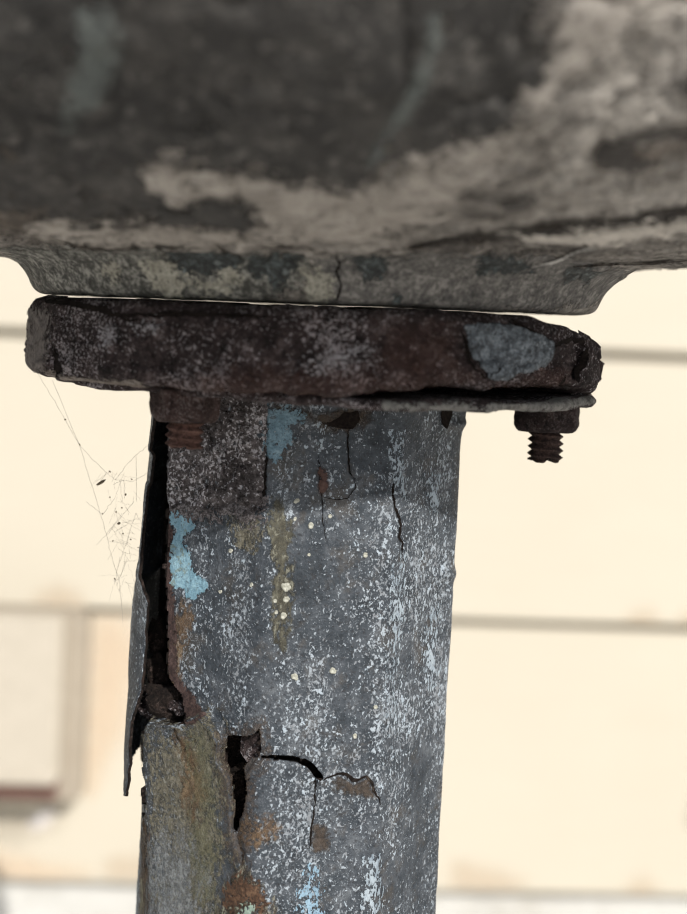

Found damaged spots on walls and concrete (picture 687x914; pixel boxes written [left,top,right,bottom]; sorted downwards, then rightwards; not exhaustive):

water stain [0,0,628,312]
water stain [591,130,687,175]
water stain [24,305,52,374]
peeling [44,370,150,388]
water stain [91,314,165,354]
water stain [289,336,377,383]
crack [317,411,360,538]
crack [392,481,404,553]
crack [137,508,207,775]
spalling [123,397,307,796]
crack [261,755,381,853]
rust [139,820,150,914]